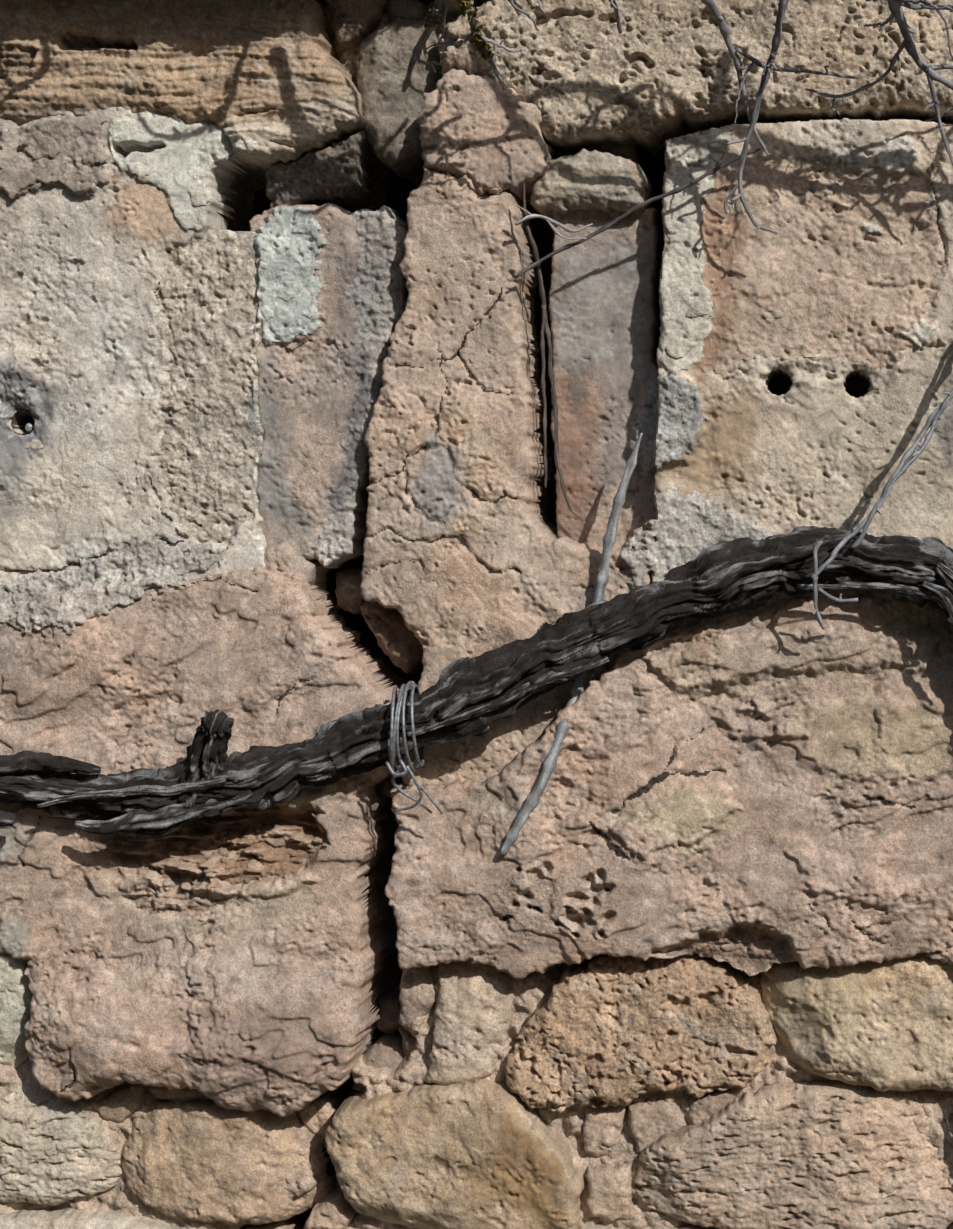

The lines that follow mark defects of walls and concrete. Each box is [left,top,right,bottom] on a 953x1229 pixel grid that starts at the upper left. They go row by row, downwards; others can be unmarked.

crack [252,187,272,215]
crack [636,129,697,250]
crack [372,166,557,528]
crack [325,287,522,685]
crack [341,1027,384,1098]
crack [322,1147,336,1176]